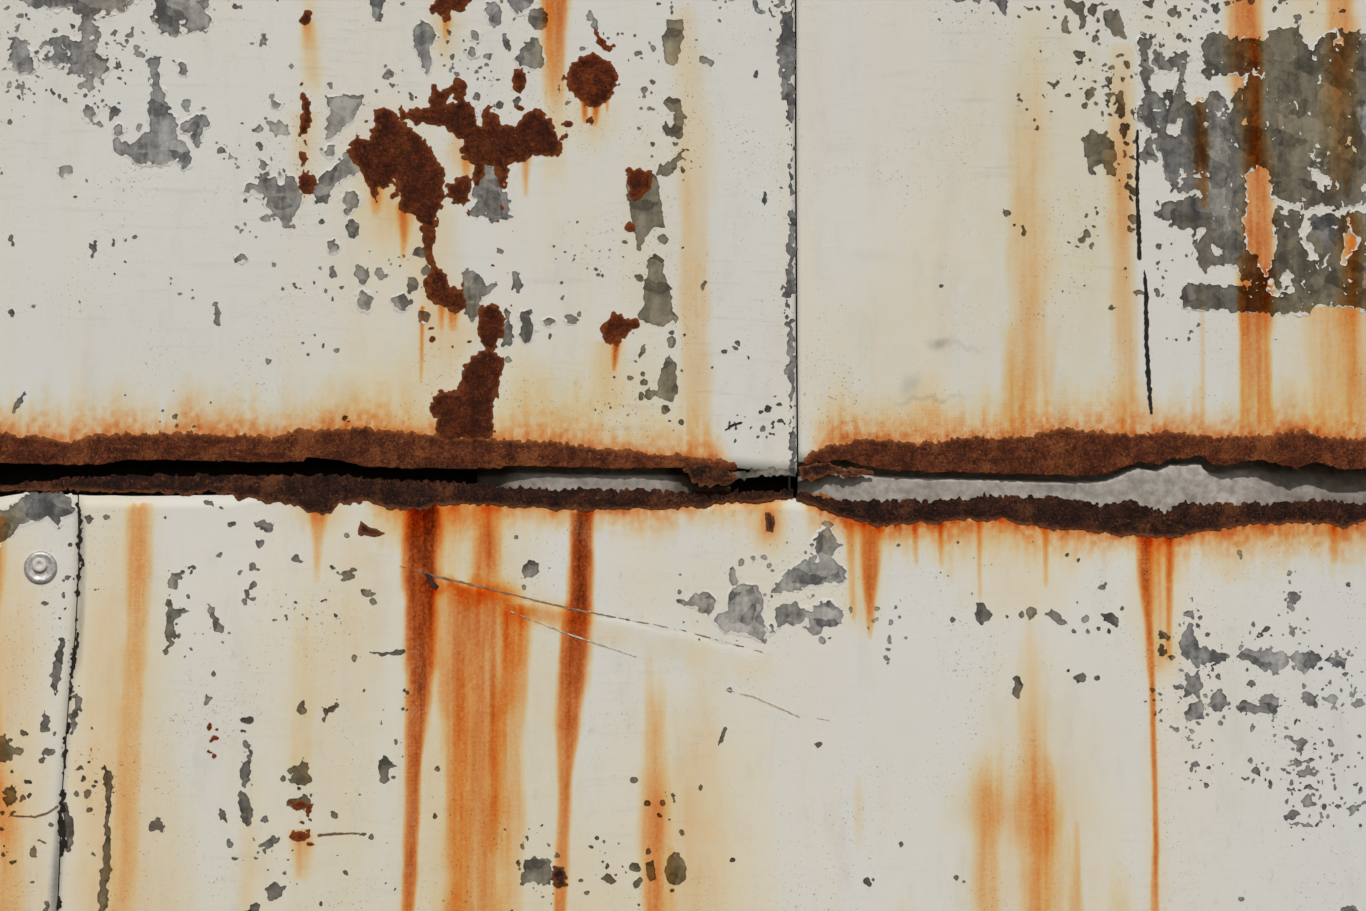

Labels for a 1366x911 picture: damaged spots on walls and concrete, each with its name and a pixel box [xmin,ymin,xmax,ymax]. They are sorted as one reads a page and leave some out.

peeling [0,0,548,326]
rust [298,82,318,194]
rust [346,77,573,314]
rust [512,67,527,93]
rust [562,28,620,125]
rust [625,167,652,201]
peeling [954,0,1366,341]
peeling [460,268,581,363]
rust [0,303,1366,895]
peeling [676,520,853,644]
peeling [971,593,1124,634]
peeling [1144,570,1366,846]